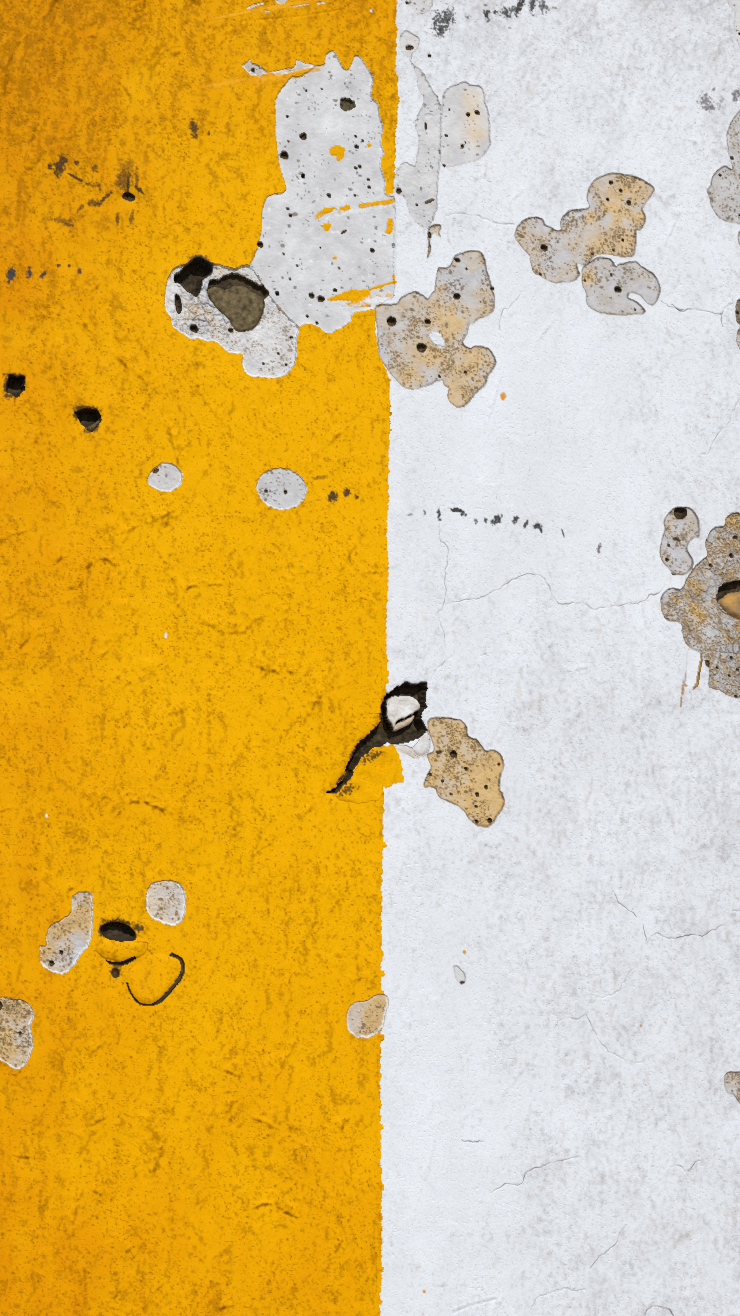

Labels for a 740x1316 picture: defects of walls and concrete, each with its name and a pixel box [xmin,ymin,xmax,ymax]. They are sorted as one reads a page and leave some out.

peeling [164,30,497,408]
peeling [515,174,661,316]
peeling [707,112,740,245]
peeling [256,468,308,510]
spalling [660,507,740,699]
peeling [424,717,505,828]
peeling [40,891,93,975]
peeling [146,881,186,926]
peeling [0,997,34,1069]
peeling [347,994,389,1038]
peeling [724,1072,740,1104]